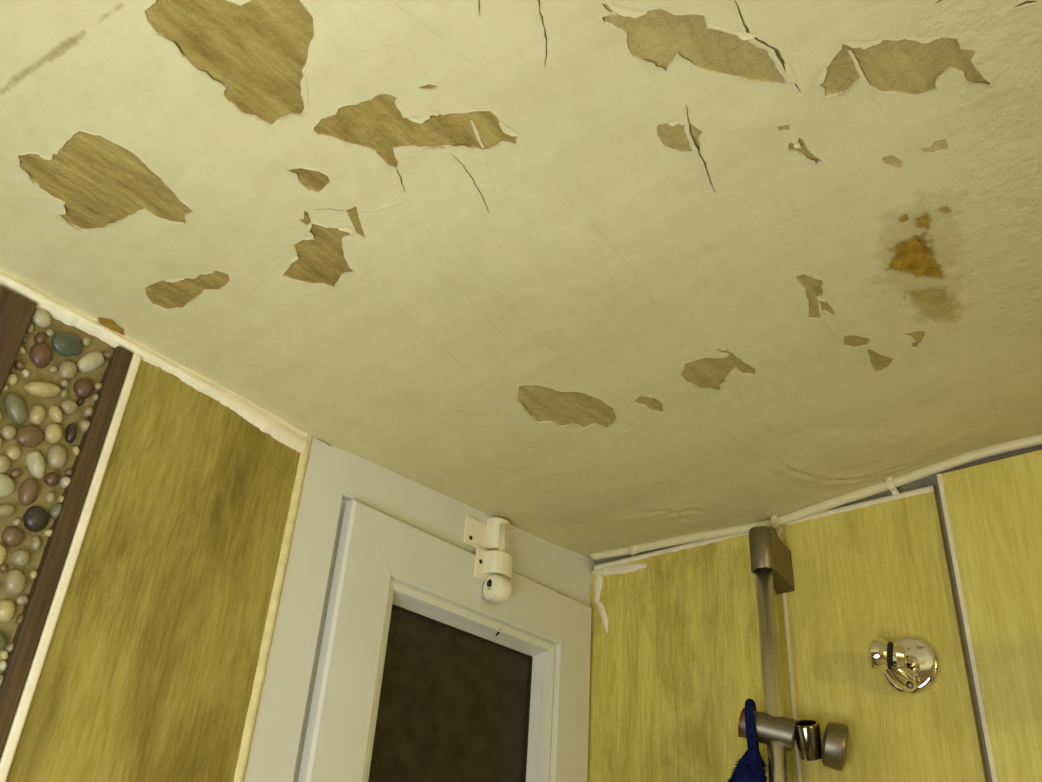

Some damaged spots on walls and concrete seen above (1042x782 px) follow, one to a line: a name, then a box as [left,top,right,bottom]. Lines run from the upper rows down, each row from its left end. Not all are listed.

peeling [142,0,317,127]
peeling [418,83,440,91]
peeling [534,0,547,68]
peeling [600,1,801,93]
peeling [814,35,995,114]
peeling [16,92,521,311]
corrosion [890,214,942,278]
peeling [794,273,927,385]
peeling [906,288,949,311]
peeling [516,334,757,448]